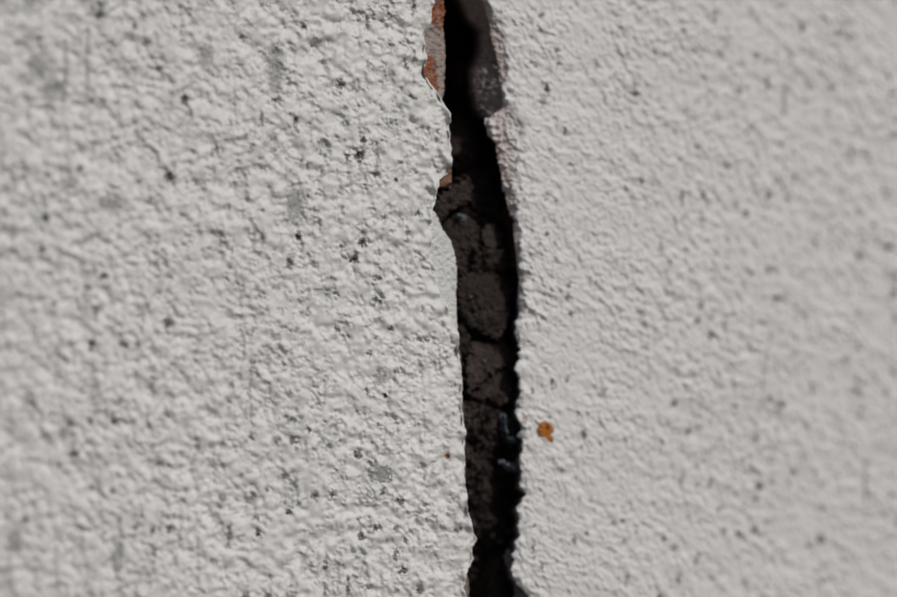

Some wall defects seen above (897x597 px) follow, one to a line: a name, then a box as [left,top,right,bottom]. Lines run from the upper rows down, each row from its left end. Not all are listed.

spalling [423,0,446,99]
spalling [438,168,452,188]
crack [422,0,526,597]
spalling [455,0,527,337]